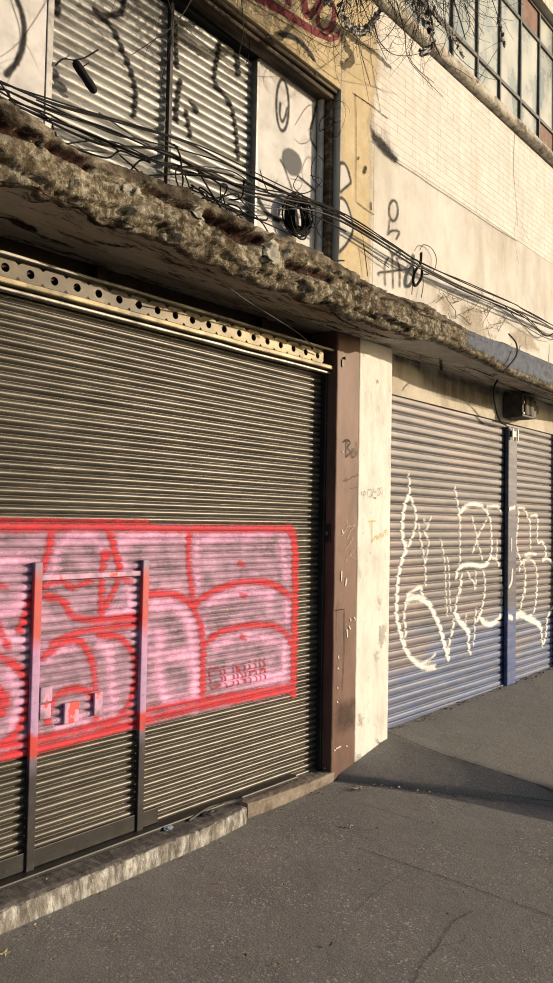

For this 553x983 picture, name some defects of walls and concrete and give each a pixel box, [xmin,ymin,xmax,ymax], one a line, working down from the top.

spalling [0,116,90,171]
spalling [8,218,37,232]
spalling [123,183,334,284]
damp [339,703,353,730]